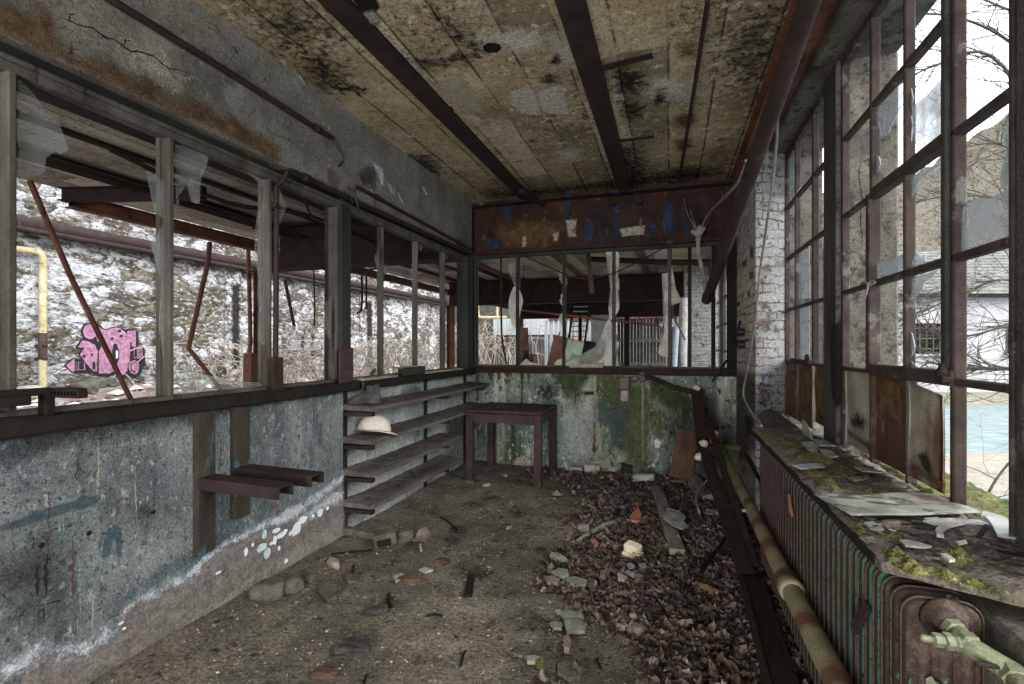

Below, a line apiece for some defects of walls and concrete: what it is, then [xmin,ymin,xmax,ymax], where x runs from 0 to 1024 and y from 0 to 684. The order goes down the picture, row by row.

crack [58,14,210,87]
rust [0,7,283,172]
water stain [220,0,367,96]
water stain [607,0,792,124]
water stain [621,140,728,188]
spalling [737,246,771,284]
water stain [561,375,596,463]
water stain [0,436,99,596]
water stain [1,474,345,684]